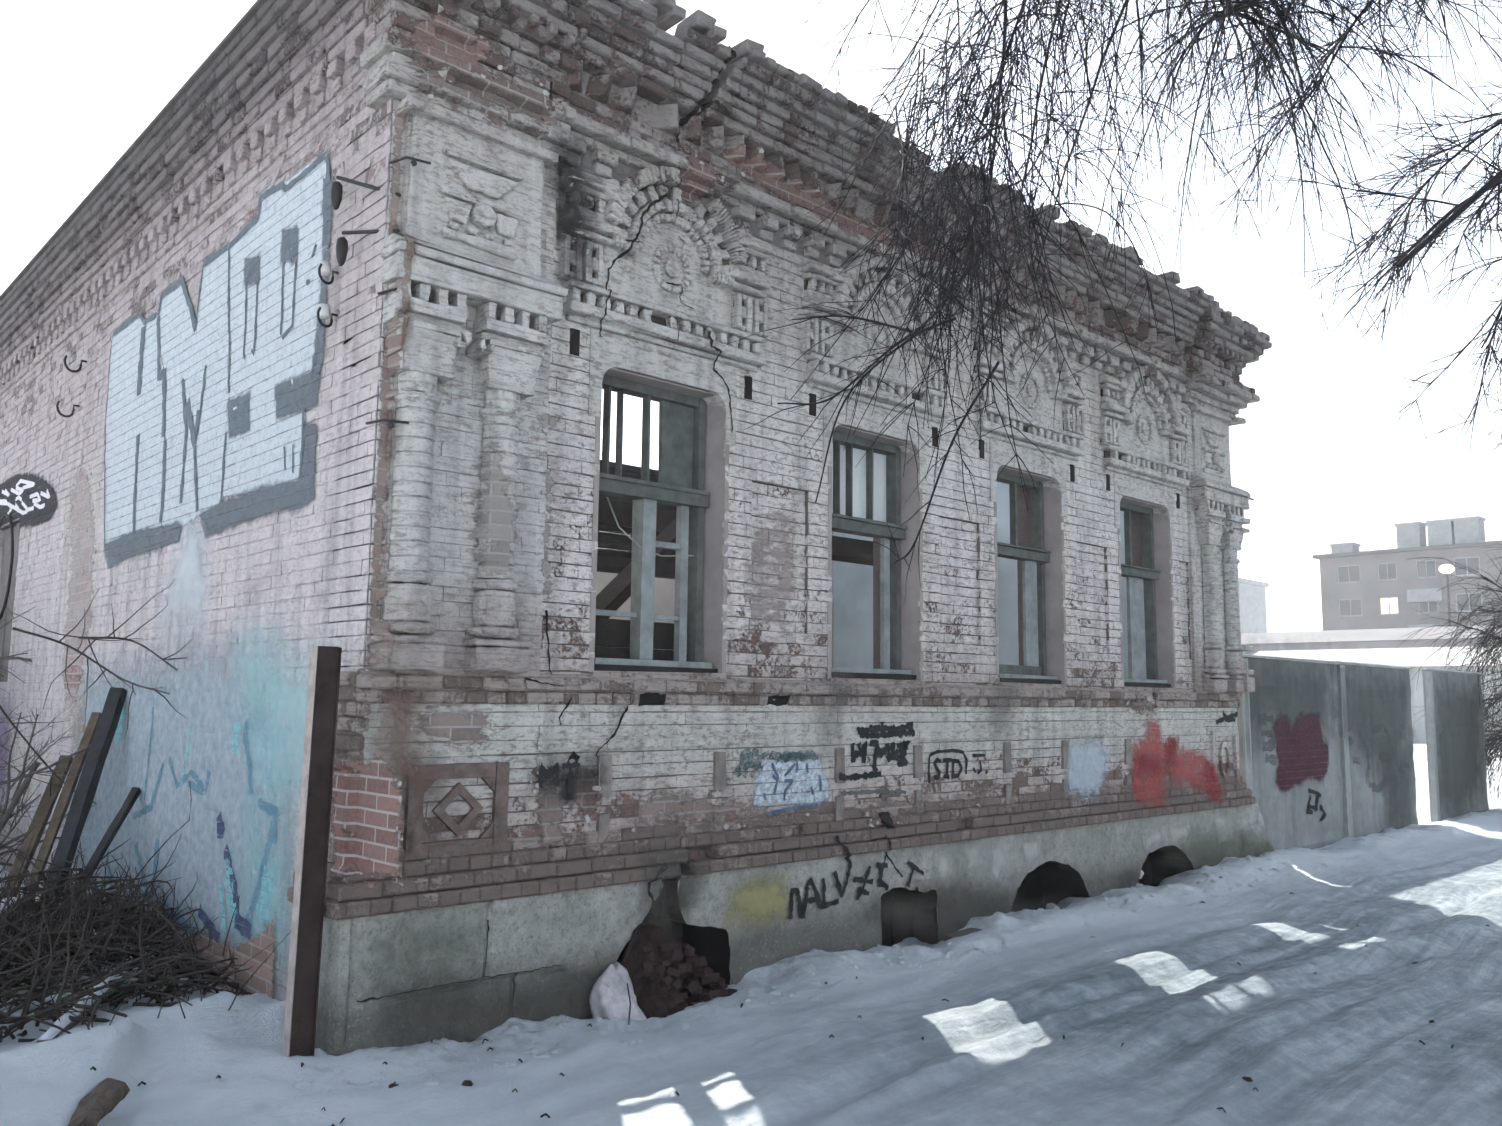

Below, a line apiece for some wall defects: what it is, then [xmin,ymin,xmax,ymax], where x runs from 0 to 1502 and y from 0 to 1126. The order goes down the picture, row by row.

crack [676,45,737,143]
crack [596,701,633,760]
crack [648,863,681,921]